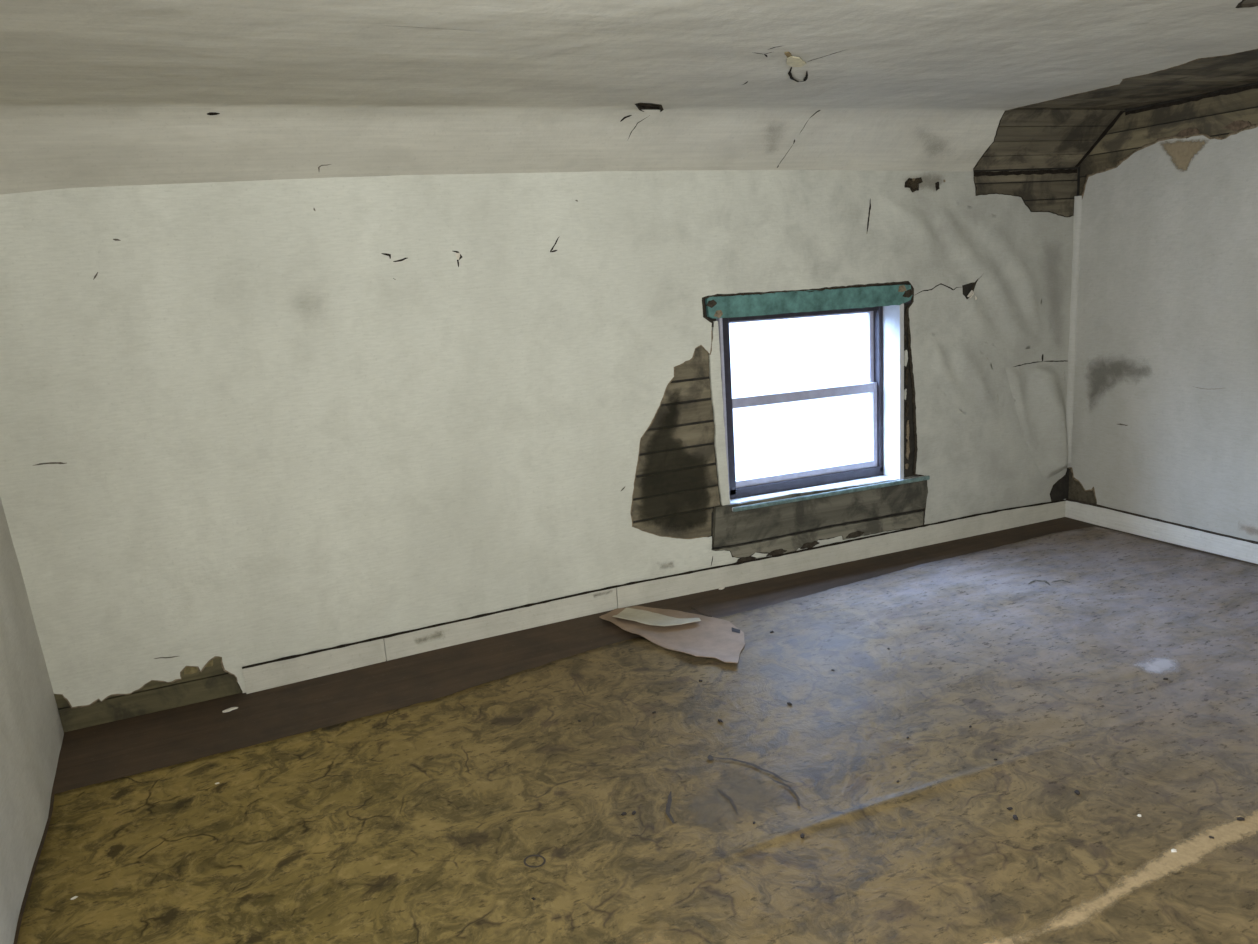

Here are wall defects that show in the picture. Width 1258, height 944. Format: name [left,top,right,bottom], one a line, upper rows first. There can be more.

peeling [1235,0,1258,8]
peeling [1175,128,1200,139]
peeling [1223,120,1252,132]
spalling [904,177,945,192]
crack [917,278,979,300]
peeling [630,331,720,539]
spalling [1050,467,1097,504]
peeling [737,541,819,562]
peeling [184,660,213,674]